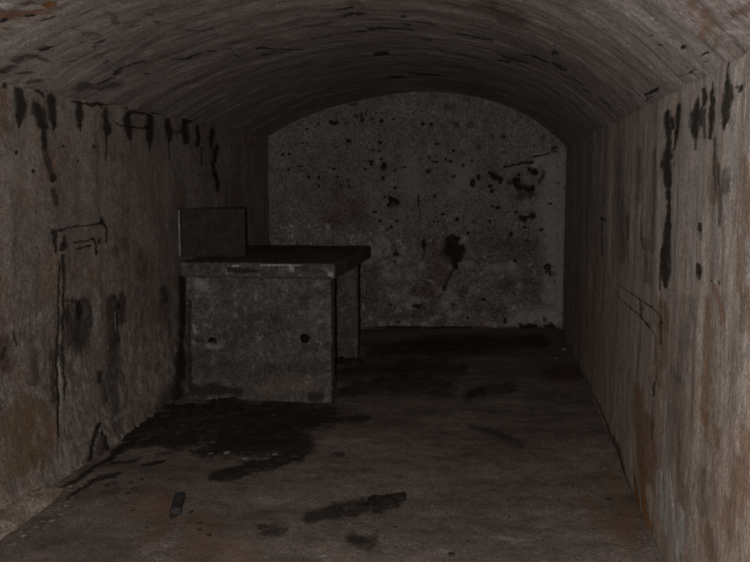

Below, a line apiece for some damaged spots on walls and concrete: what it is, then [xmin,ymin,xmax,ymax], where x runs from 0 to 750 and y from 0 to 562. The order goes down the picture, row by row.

damp [0,46,58,205]
damp [76,102,84,132]
damp [164,118,220,193]
damp [659,103,680,290]
damp [689,62,743,170]
crack [51,218,108,437]
damp [64,275,336,498]
damp [304,500,383,523]